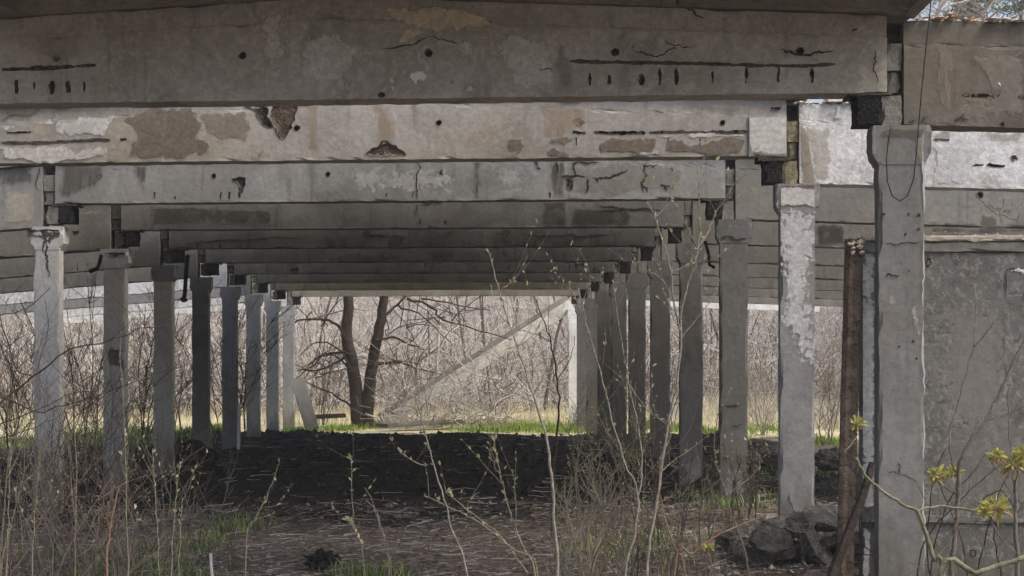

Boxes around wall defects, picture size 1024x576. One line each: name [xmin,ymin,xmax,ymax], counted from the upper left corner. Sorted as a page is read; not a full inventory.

crack [383,36,460,49]
peeling [384,7,490,43]
crack [632,39,692,57]
crack [782,48,833,56]
peeling [1,106,298,164]
spalling [367,143,406,157]
spalling [220,176,245,199]
crack [530,161,670,266]
peeling [781,106,852,365]
crack [42,238,51,277]